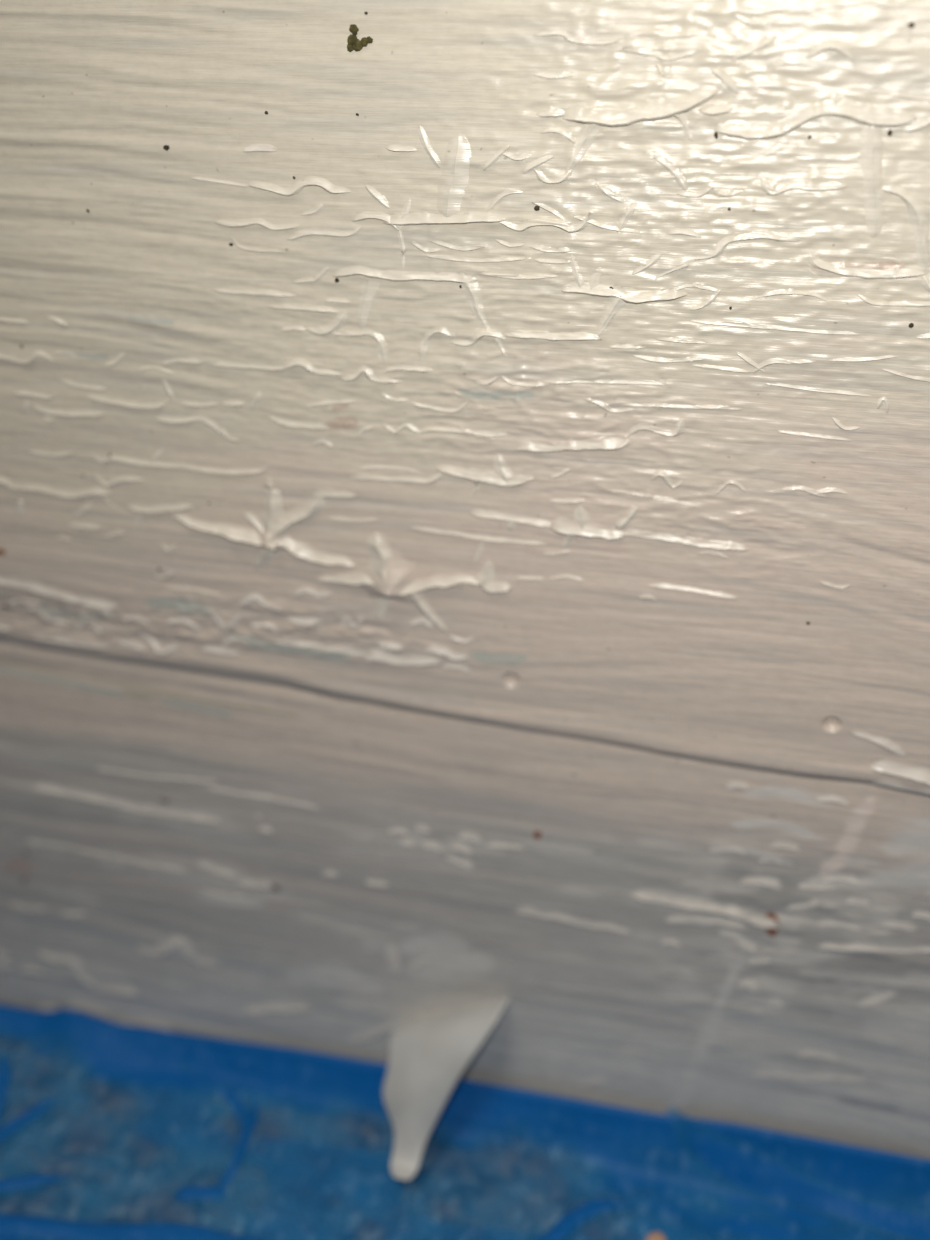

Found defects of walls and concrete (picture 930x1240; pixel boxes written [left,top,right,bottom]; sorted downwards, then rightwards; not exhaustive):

peeling [0,576,201,654]
peeling [201,586,476,672]
peeling [850,730,930,795]
peeling [383,998,510,1180]